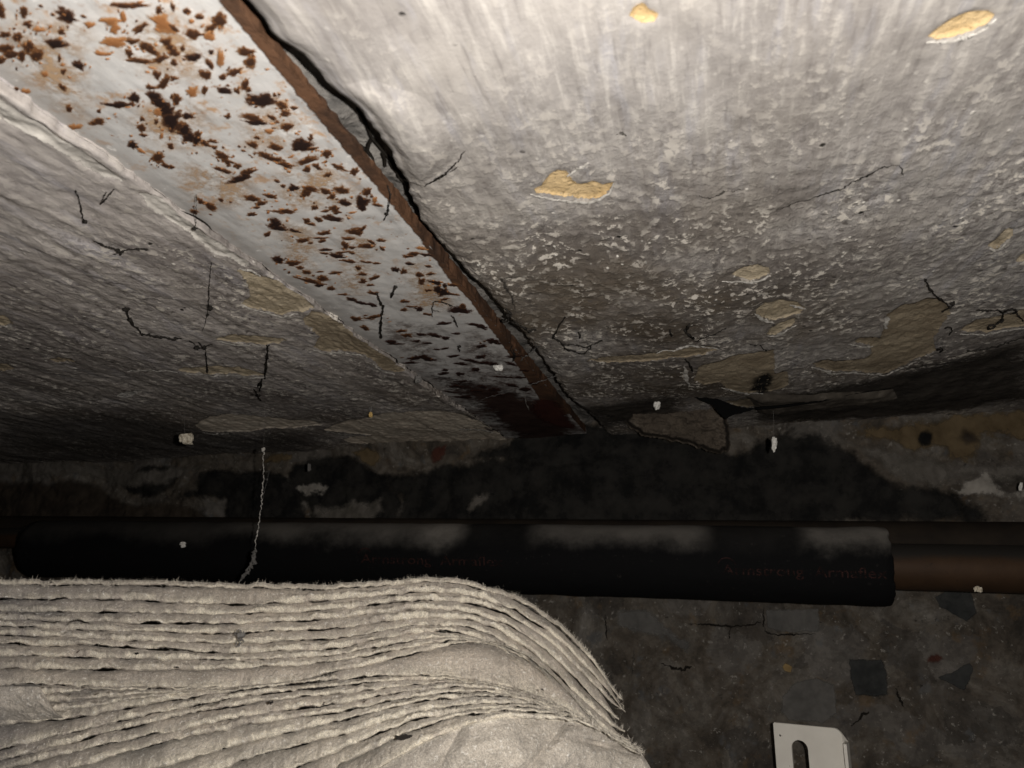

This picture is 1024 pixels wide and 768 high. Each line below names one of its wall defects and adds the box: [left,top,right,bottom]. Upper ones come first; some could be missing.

spalling [926,10,997,44]
crack [153,188,240,251]
corrosion [0,0,586,438]
crack [356,107,465,214]
spalling [530,162,614,205]
crack [778,165,904,210]
spalling [127,192,422,383]
crack [500,276,524,310]
spalling [722,264,770,285]
spalling [811,298,951,376]
flaking render [588,299,806,454]
damp [0,425,986,522]